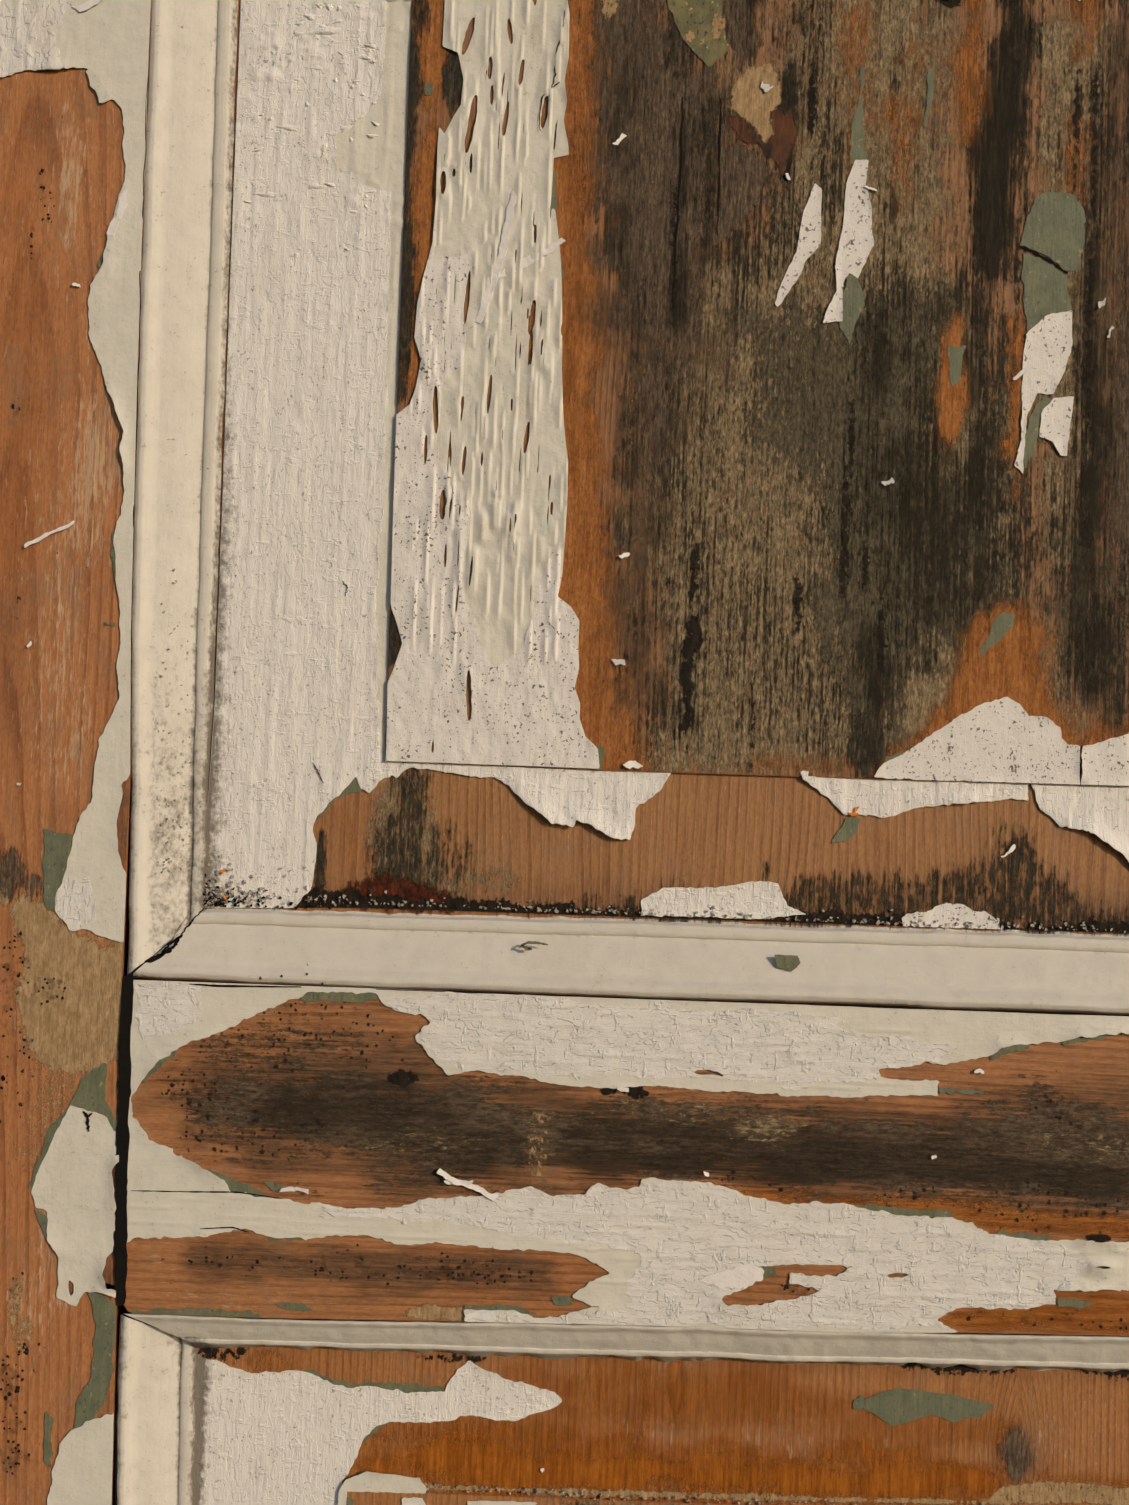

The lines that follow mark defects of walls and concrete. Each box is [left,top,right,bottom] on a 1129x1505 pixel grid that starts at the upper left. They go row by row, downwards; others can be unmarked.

peeling [307,0,1129,932]
peeling [0,67,609,1505]
mould [314,829,327,892]
mould [367,768,475,901]
leakage [582,892,738,924]
peeling [775,955,800,971]
leakage [765,823,1129,937]
peeling [131,992,1129,1243]
leakage [161,1002,1129,1235]
peeling [699,1264,852,1306]
peeling [1054,1289,1129,1308]
peeling [192,1346,1129,1505]